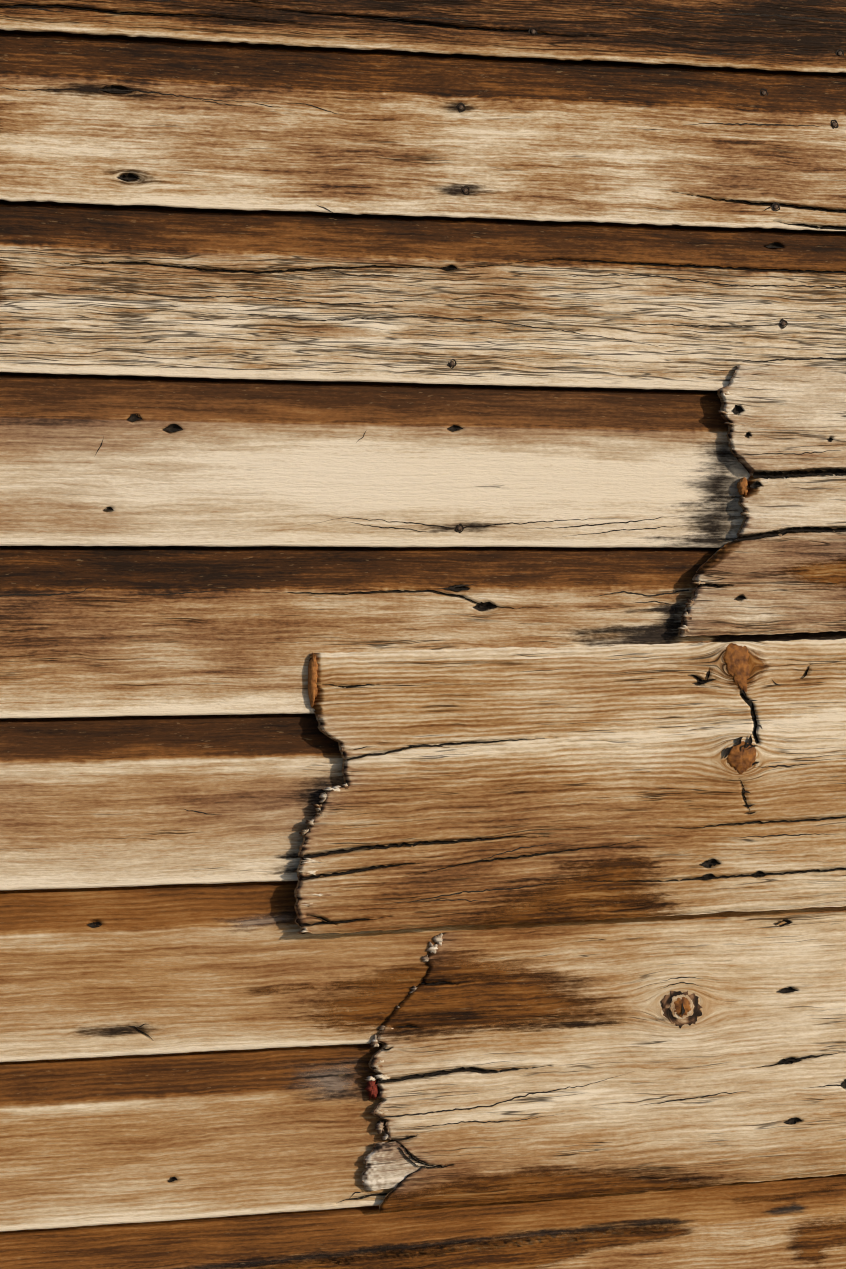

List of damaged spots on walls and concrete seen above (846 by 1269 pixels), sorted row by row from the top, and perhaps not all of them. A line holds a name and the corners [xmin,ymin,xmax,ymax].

leakage [680,442,741,547]
crack [252,583,548,609]
crack [589,584,733,606]
crack [676,667,846,838]
peeling [299,783,350,835]
peeling [295,858,324,875]
crack [301,836,846,926]
peeling [421,933,443,962]
crack [421,979,454,987]
peeling [364,1025,394,1140]
crack [378,1025,634,1168]
crack [645,1052,846,1105]